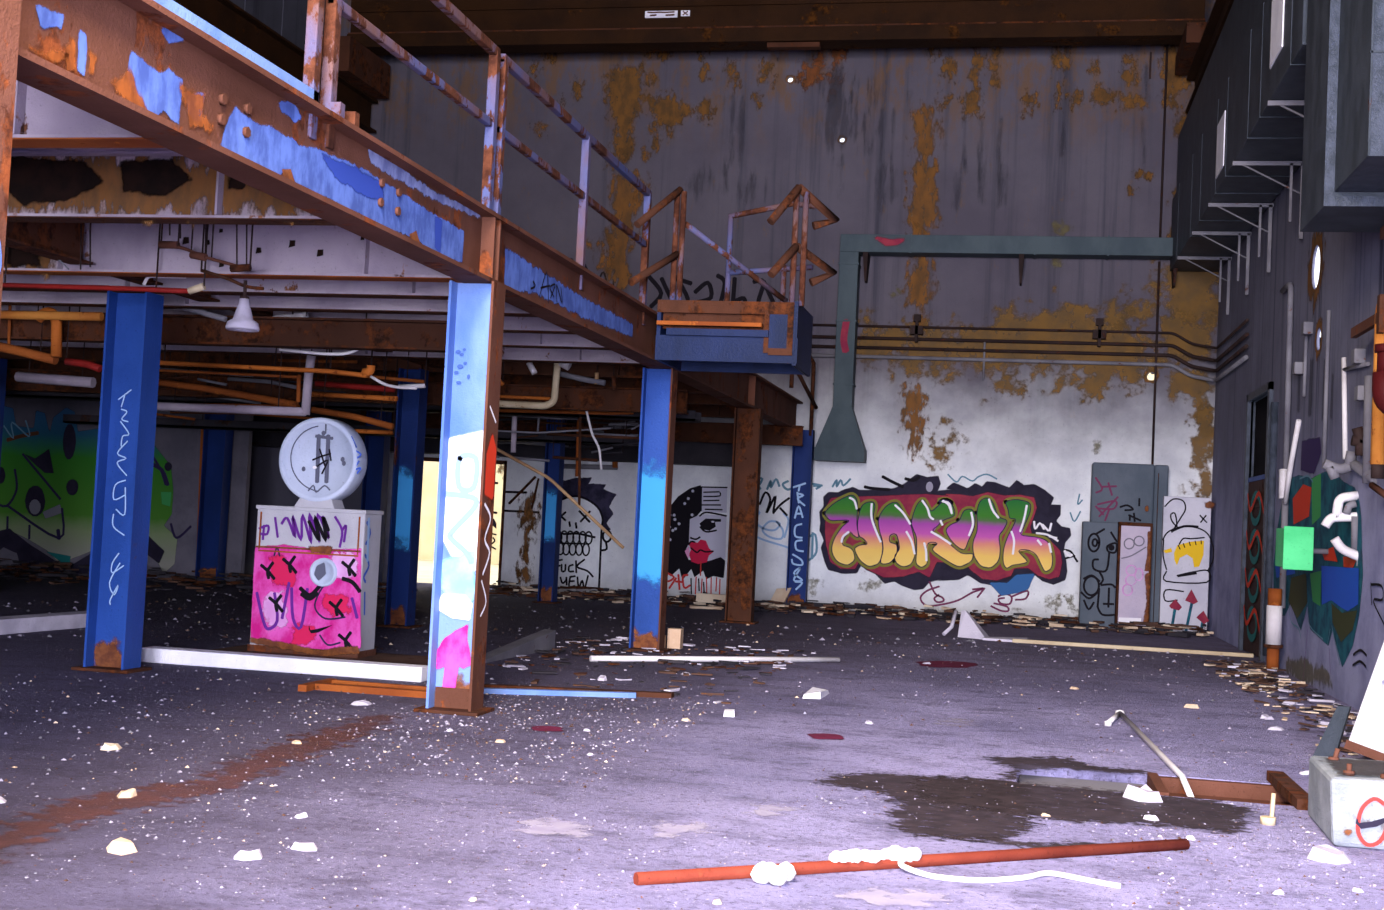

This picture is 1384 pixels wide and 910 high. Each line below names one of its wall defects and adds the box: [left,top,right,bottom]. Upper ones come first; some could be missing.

rust [586,148,650,290]
peeling [602,49,849,170]
rust [903,103,944,235]
rust [856,256,1219,498]
rust [94,638,122,668]
damp [809,755,1258,848]